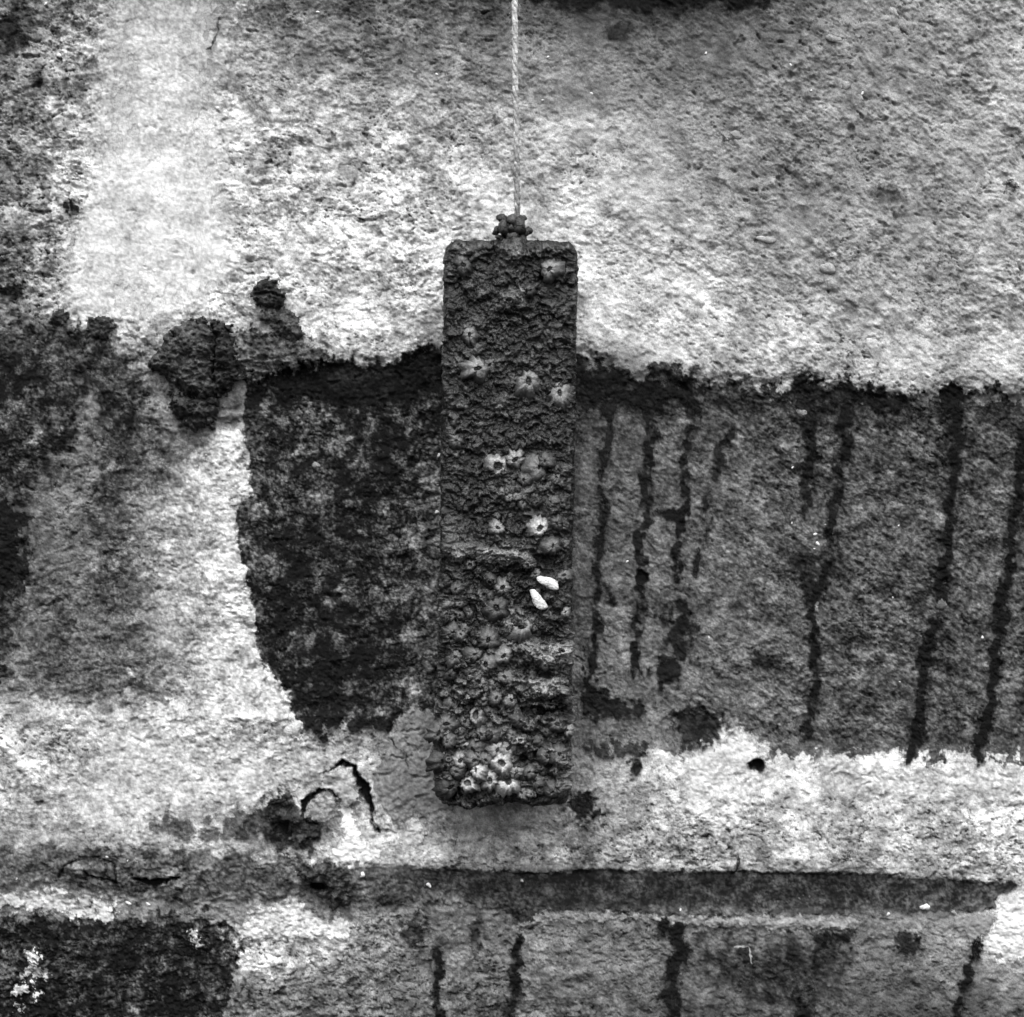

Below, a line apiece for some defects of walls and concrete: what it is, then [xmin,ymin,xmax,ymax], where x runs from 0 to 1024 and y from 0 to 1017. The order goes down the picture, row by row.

water stain [236,339,443,733]
water stain [571,351,1024,768]
crack [301,759,381,833]
water stain [430,946,446,1017]
water stain [502,935,526,1017]
water stain [656,916,856,1017]
water stain [892,930,930,957]
water stain [952,936,984,1017]